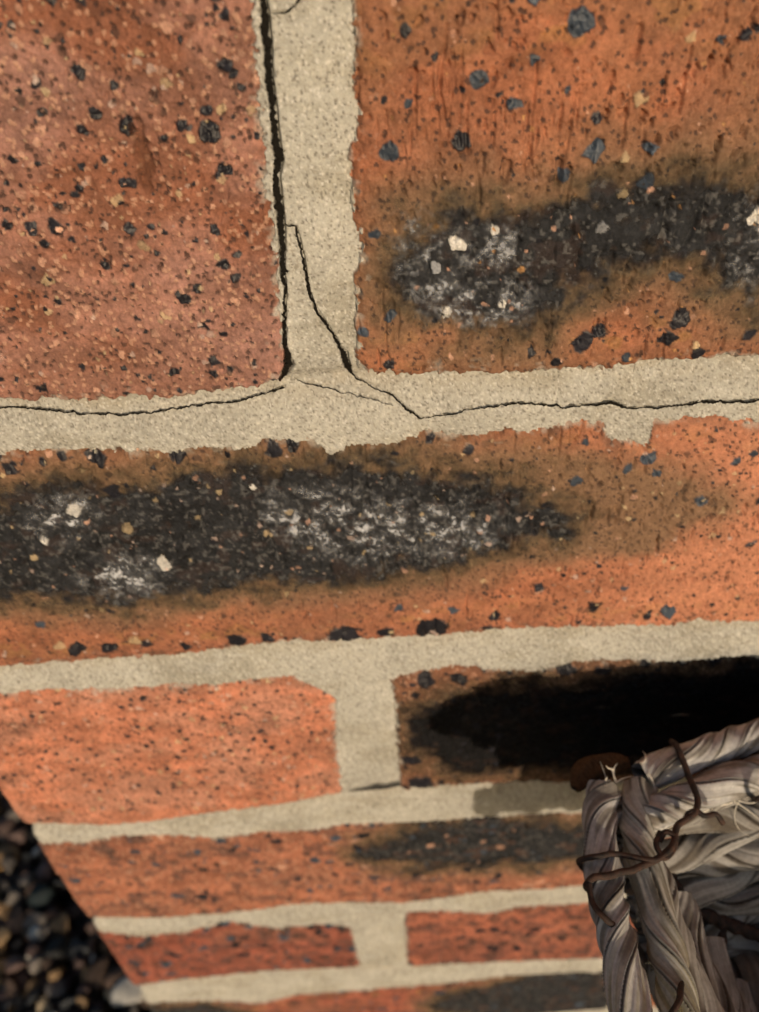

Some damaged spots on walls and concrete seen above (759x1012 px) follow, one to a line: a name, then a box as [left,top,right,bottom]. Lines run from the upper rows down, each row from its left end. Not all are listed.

crack [0,0,759,419]
damp [383,160,759,343]
damp [0,449,589,616]
damp [398,655,759,781]